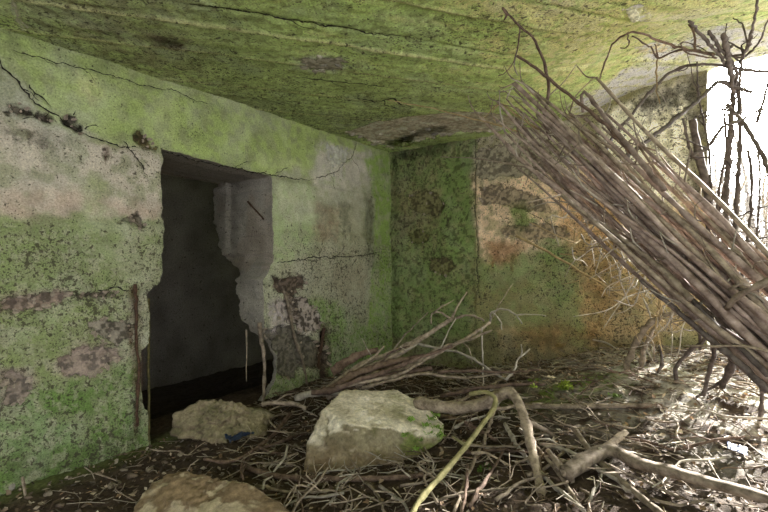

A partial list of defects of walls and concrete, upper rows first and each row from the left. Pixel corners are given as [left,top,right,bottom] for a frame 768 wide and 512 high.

crack [190,4,400,36]
crack [0,50,207,175]
peeling [345,111,526,149]
crack [278,246,381,274]
rust [132,284,151,445]